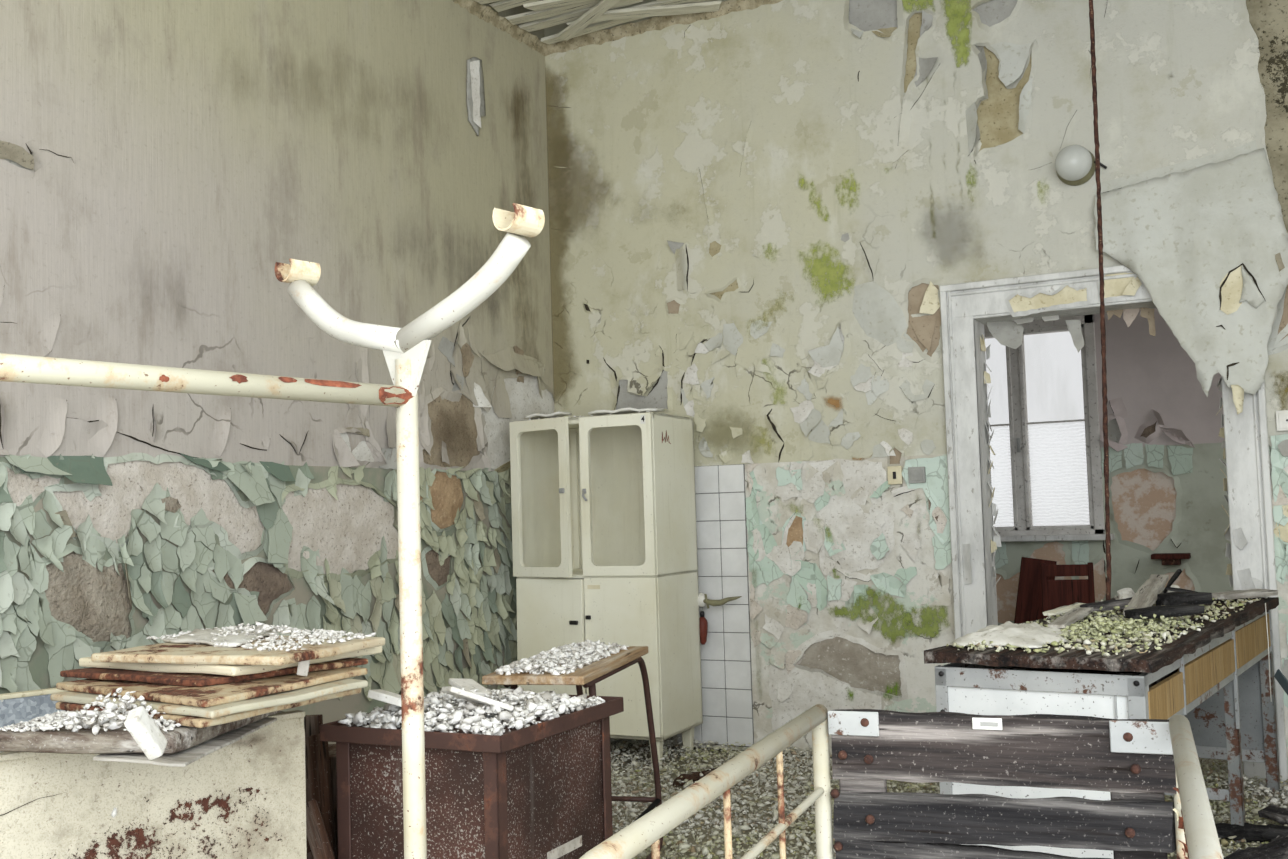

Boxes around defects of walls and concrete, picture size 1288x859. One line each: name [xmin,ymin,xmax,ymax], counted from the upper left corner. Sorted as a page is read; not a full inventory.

peeling [965,0,1039,161]
leakage [1258,28,1288,113]
crack [17,309,60,357]
crack [0,392,314,460]
flaking render [0,404,401,701]
crack [355,346,396,473]
peeling [418,322,556,699]
leakage [545,77,594,399]
peeling [612,237,972,732]
flaking render [980,334,1114,625]
peeling [1005,148,1288,592]
rust [42,787,282,859]